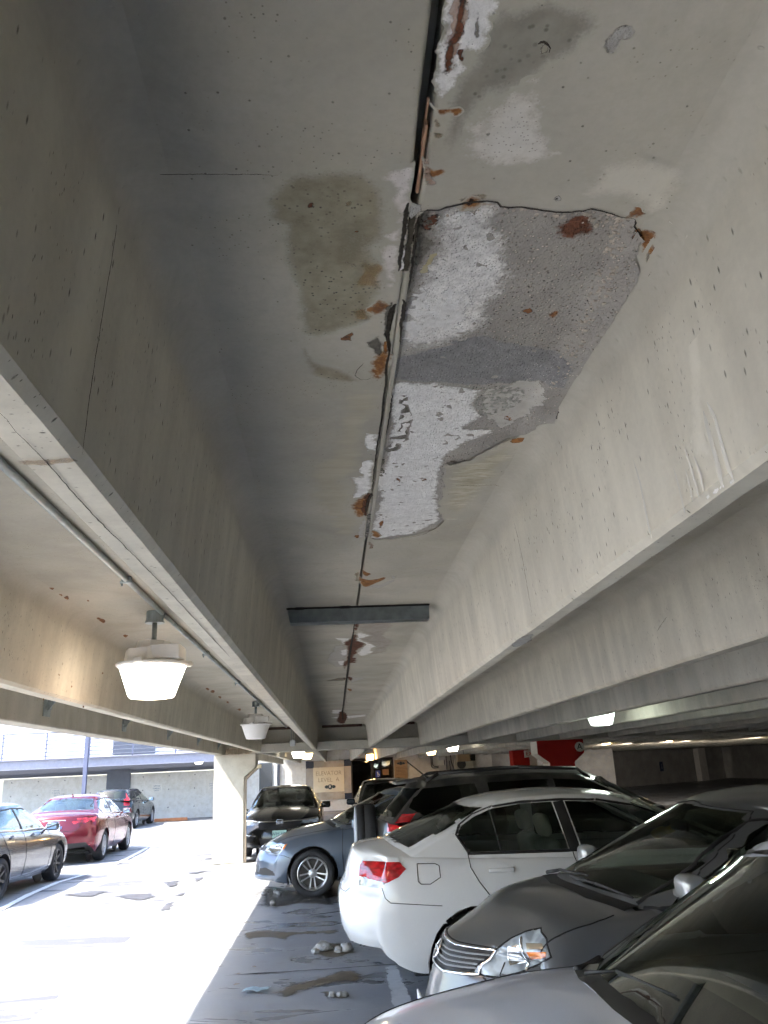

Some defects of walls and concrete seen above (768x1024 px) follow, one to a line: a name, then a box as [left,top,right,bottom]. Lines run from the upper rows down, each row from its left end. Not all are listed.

water stain [431,0,606,171]
peeling [602,24,636,56]
corrosion [422,156,446,185]
corrosion [554,213,597,240]
corrosion [623,207,658,256]
crack [365,299,406,513]
water stain [260,161,577,539]
spalling [373,198,645,539]
crack [327,624,355,719]